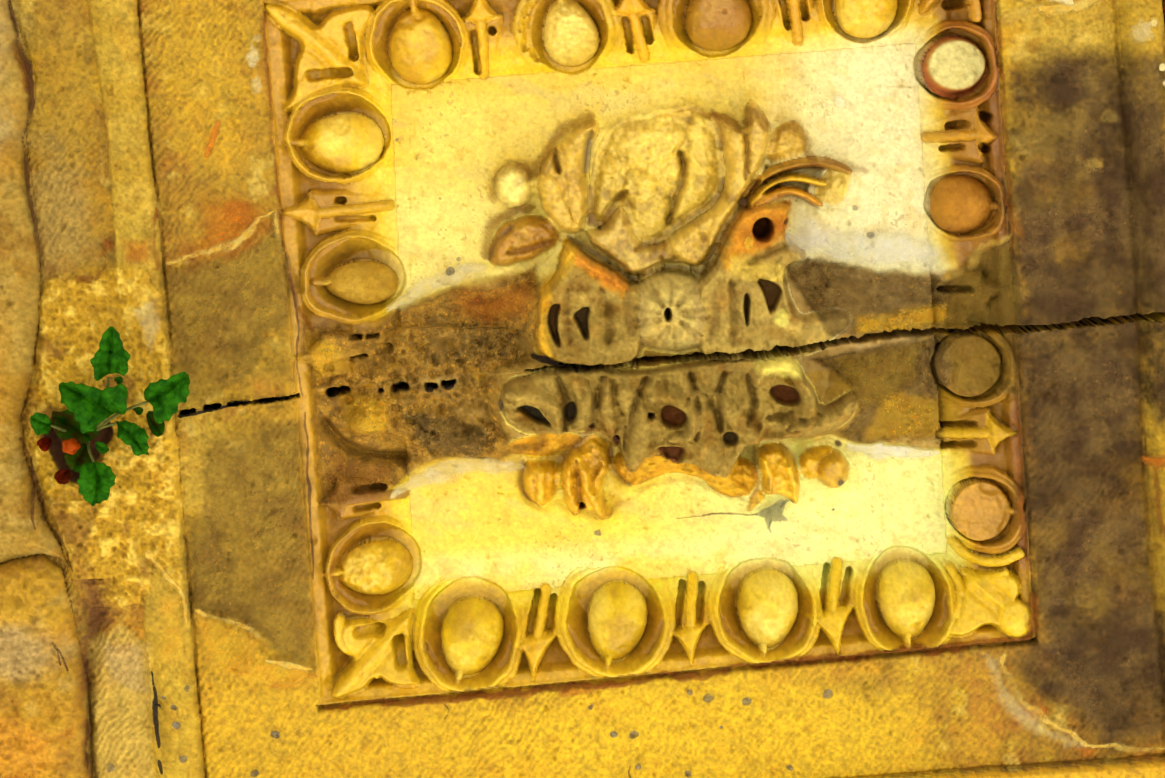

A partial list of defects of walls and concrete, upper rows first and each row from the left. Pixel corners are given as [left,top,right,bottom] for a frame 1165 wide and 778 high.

damp [1030,0,1099,15]
crack [531,353,588,373]
damp [786,56,1165,745]